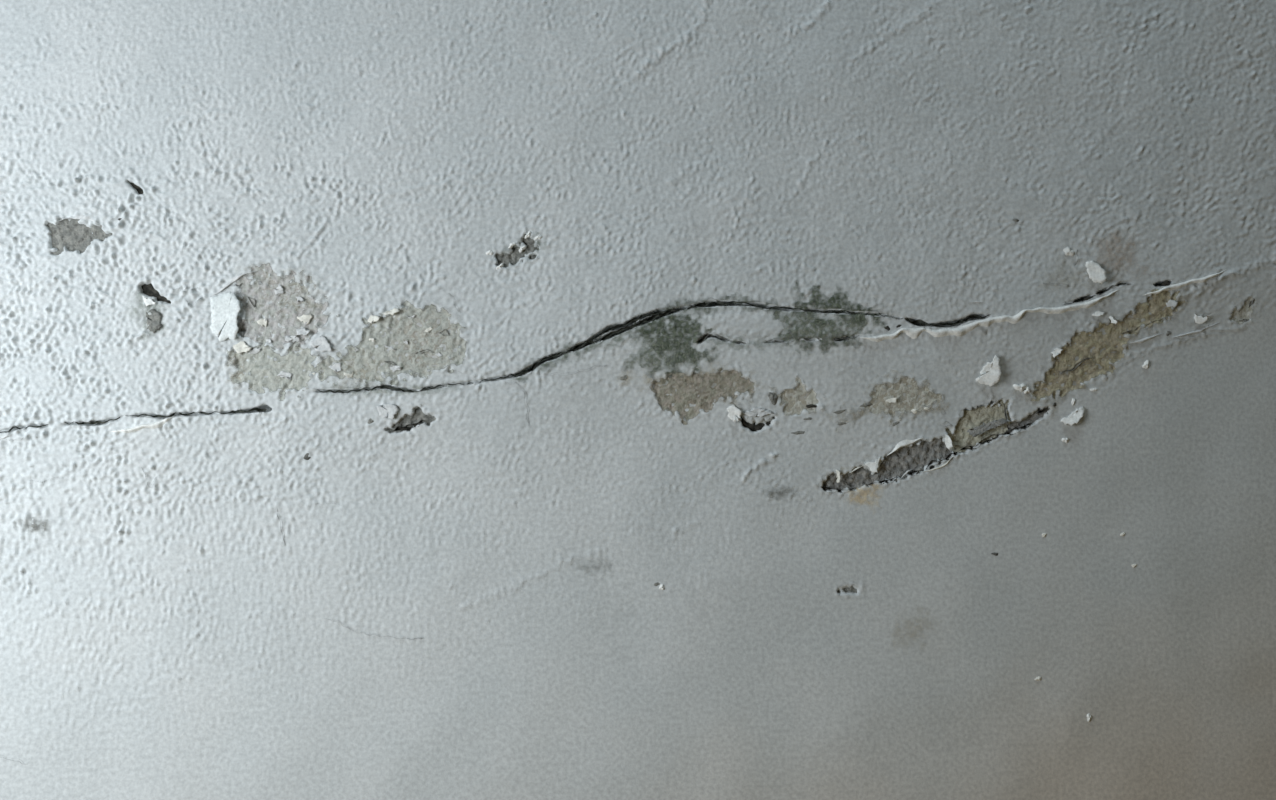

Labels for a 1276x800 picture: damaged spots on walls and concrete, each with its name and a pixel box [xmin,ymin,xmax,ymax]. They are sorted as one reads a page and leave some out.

flaking render [47,215,122,255]
flaking render [486,231,542,270]
peeling [1063,247,1107,284]
peeling [141,283,178,333]
peeling [188,263,466,401]
mould [626,308,712,377]
crack [318,270,1225,423]
mould [774,282,884,350]
crack [0,408,269,441]
flaking render [368,404,436,433]
peeling [648,368,818,434]
flaking render [822,289,1255,502]